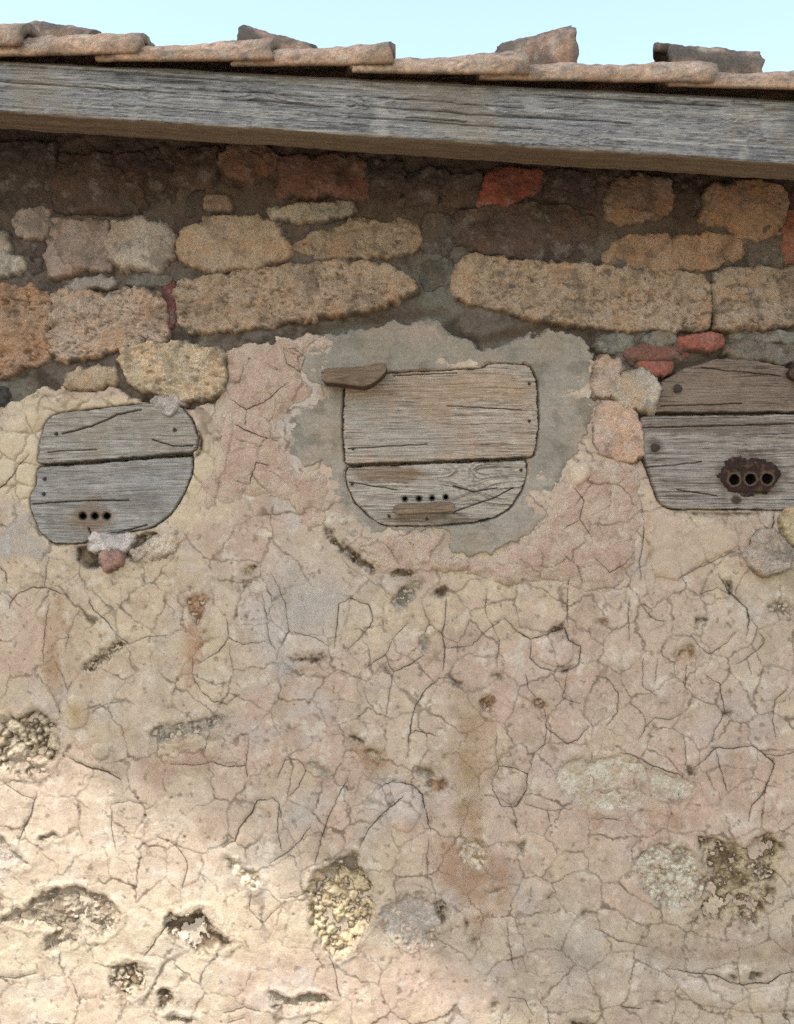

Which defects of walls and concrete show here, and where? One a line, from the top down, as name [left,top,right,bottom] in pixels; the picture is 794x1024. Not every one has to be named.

crack [192,577,373,704]
spalling [0,708,62,779]
crack [367,580,585,822]
crack [619,658,793,817]
crack [69,757,147,850]
crack [225,758,348,862]
crack [360,780,431,876]
spalling [0,884,122,954]
spalling [108,961,149,1007]
spalling [162,906,237,957]
spalling [304,849,444,962]
crack [671,968,793,985]